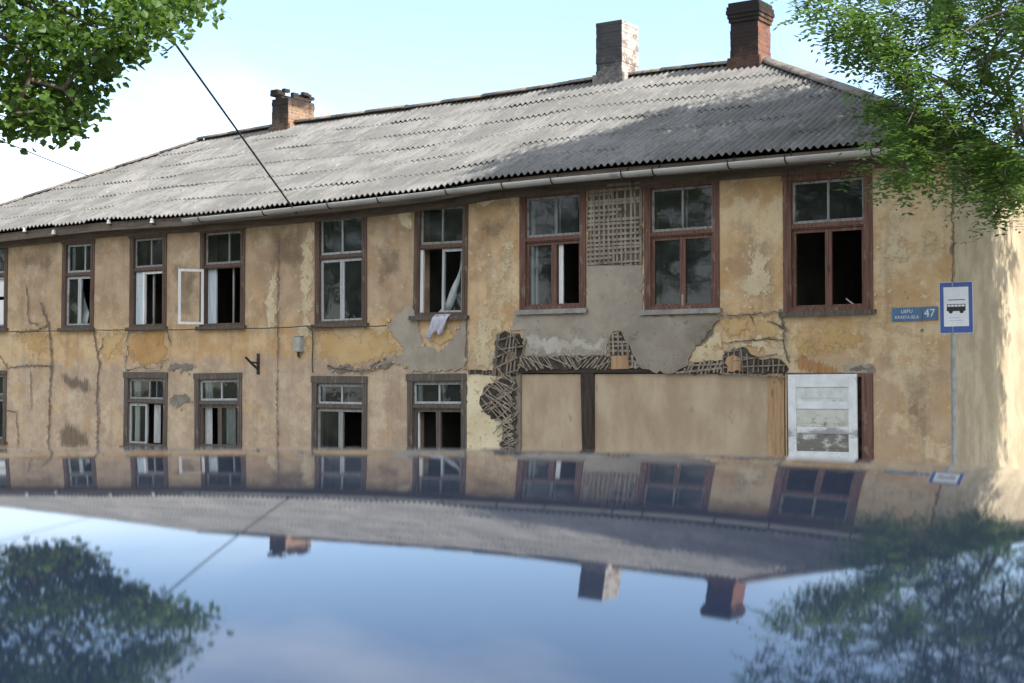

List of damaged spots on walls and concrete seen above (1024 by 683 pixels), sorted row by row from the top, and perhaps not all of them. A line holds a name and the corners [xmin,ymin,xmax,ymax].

crack [0,287,54,448]
water stain [62,425,87,448]
water stain [64,376,88,392]
crack [93,330,172,448]
spalling [296,182,644,449]